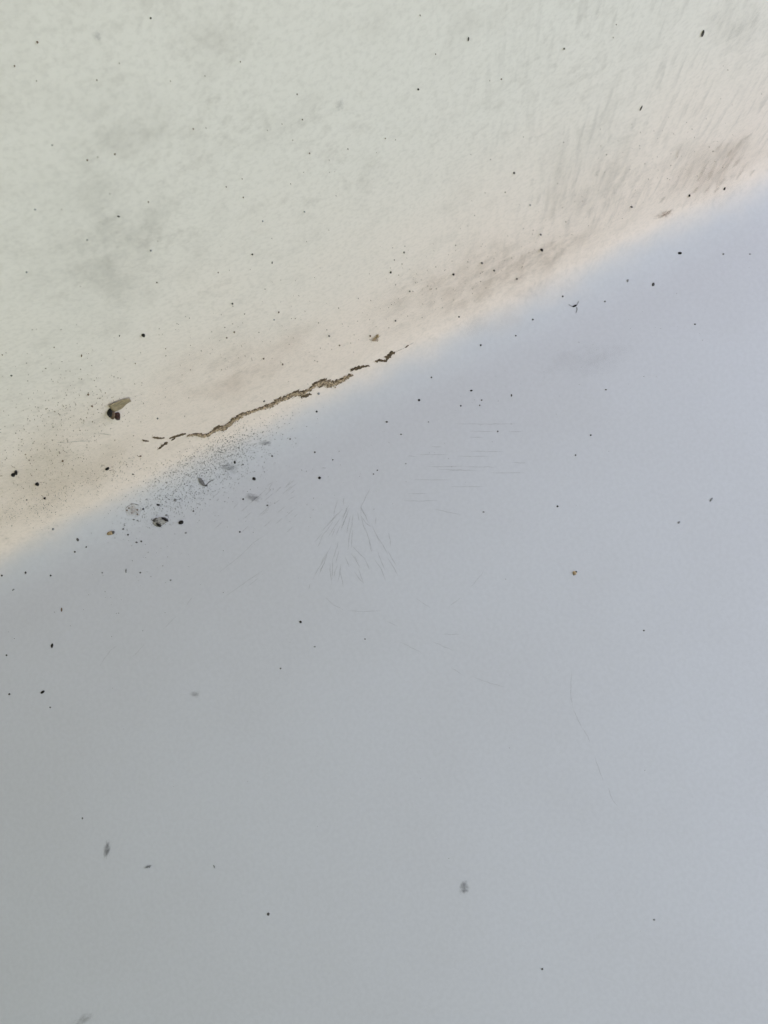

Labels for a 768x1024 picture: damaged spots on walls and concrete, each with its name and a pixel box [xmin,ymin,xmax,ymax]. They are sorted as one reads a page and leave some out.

crack [143,345,409,449]